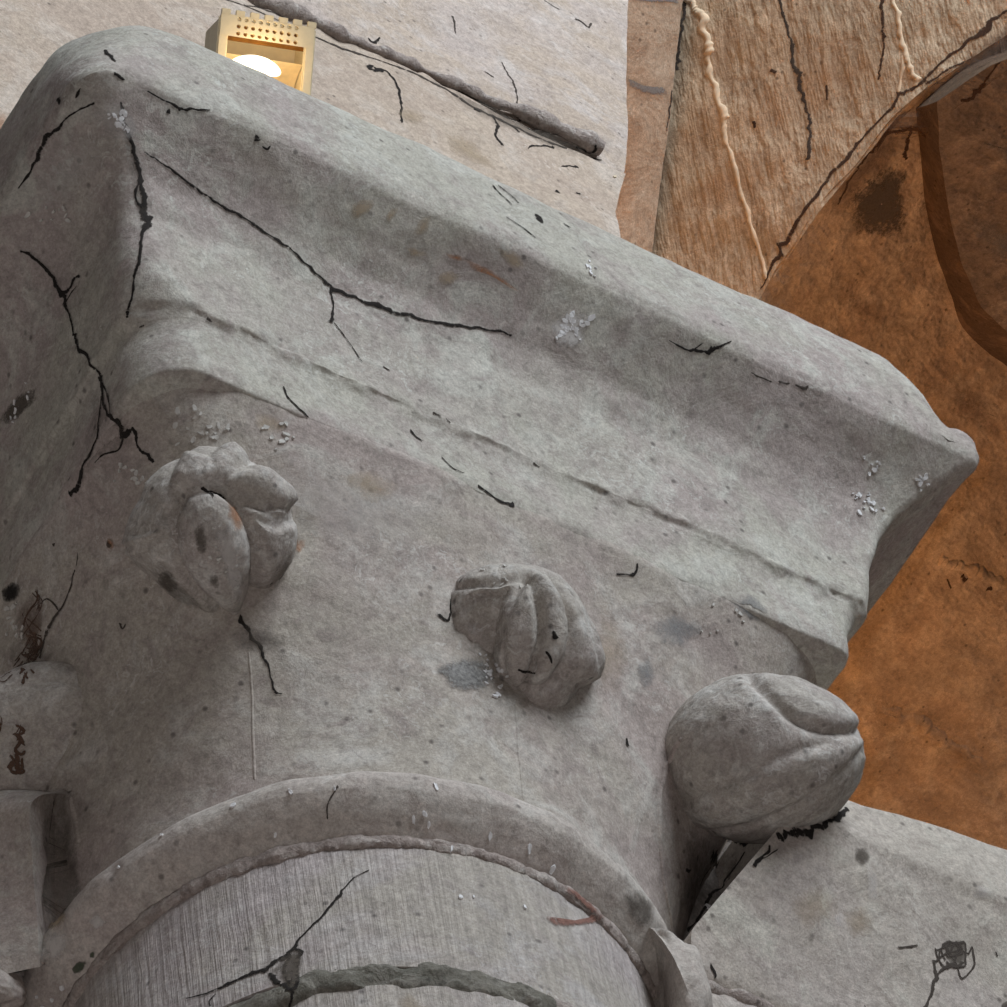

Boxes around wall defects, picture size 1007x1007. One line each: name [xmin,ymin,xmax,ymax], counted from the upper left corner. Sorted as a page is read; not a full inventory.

crack [18,88,94,189]
crack [104,49,512,370]
crack [760,0,1007,289]
crack [20,250,155,497]
crack [238,614,282,694]
crack [686,807,850,932]
crack [186,870,369,1007]
crack [898,944,964,1007]